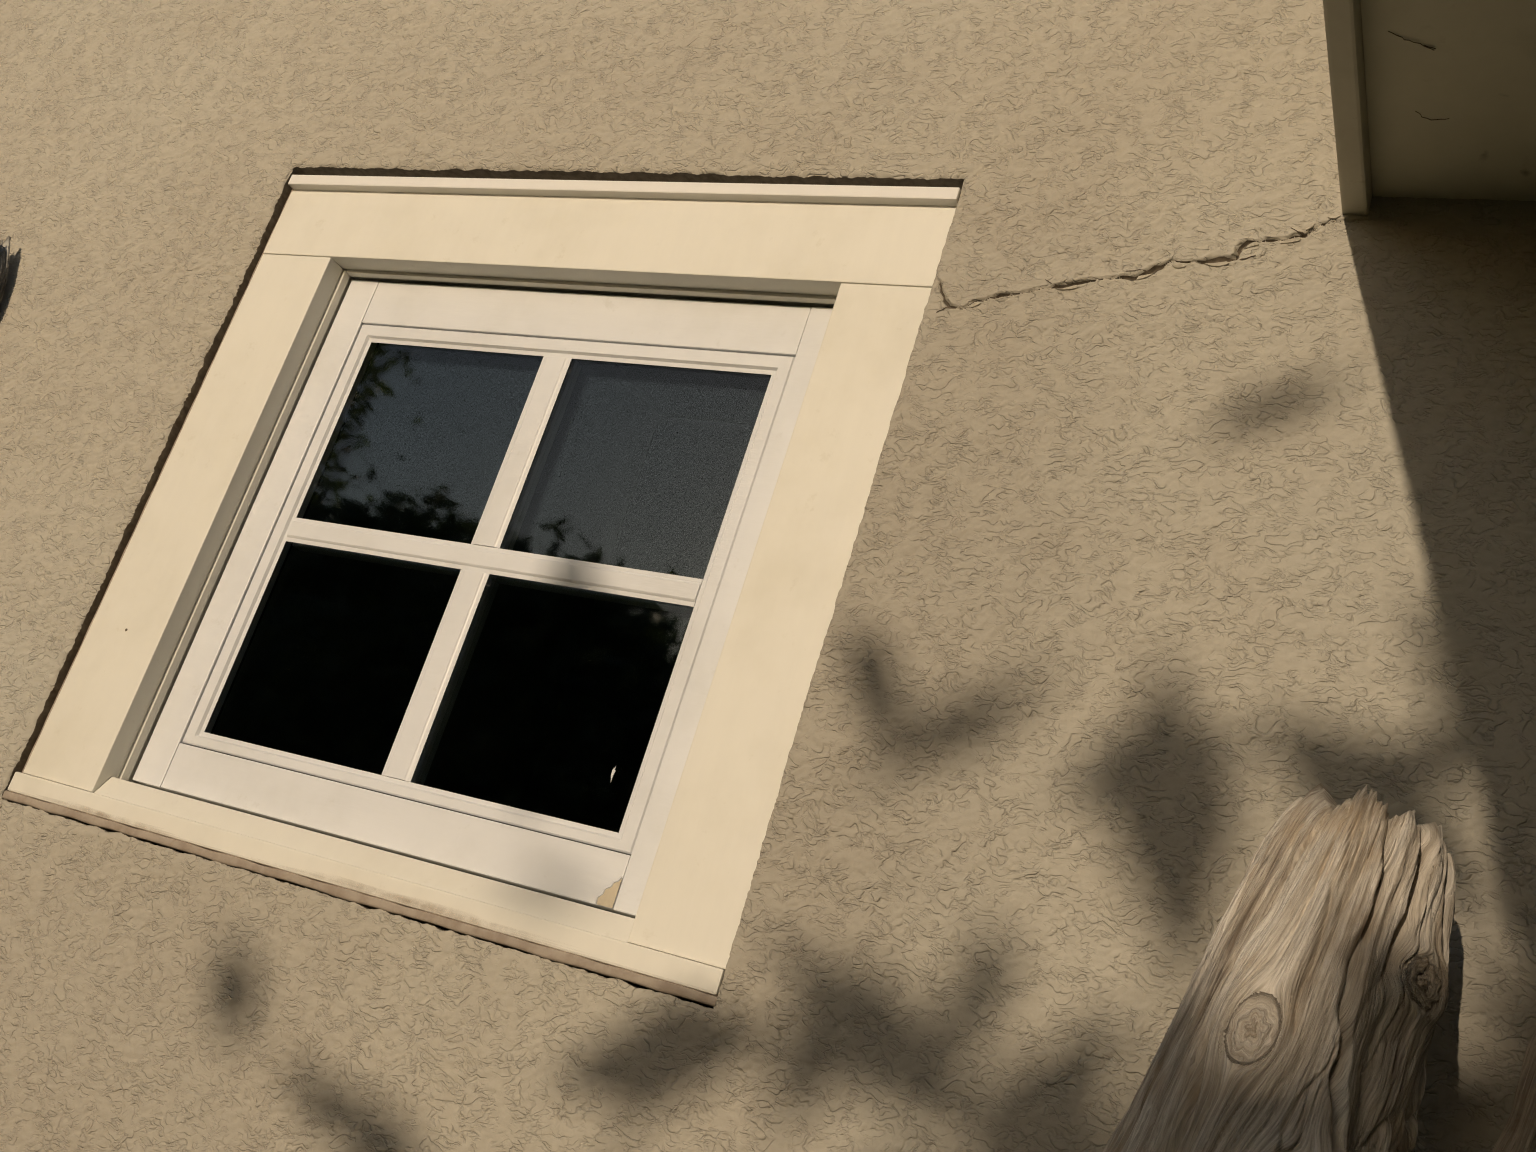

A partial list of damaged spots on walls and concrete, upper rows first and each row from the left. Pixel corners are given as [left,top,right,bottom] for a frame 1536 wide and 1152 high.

crack [936,213,1341,313]